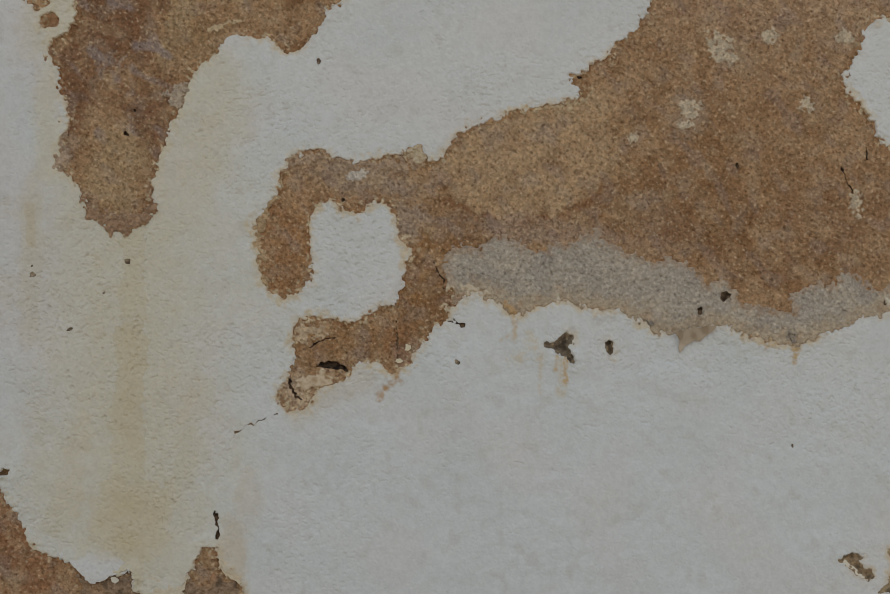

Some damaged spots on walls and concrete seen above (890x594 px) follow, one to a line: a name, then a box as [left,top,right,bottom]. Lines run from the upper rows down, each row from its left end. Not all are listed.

peeling [23,0,341,238]
peeling [253,0,890,412]
peeling [0,489,244,594]